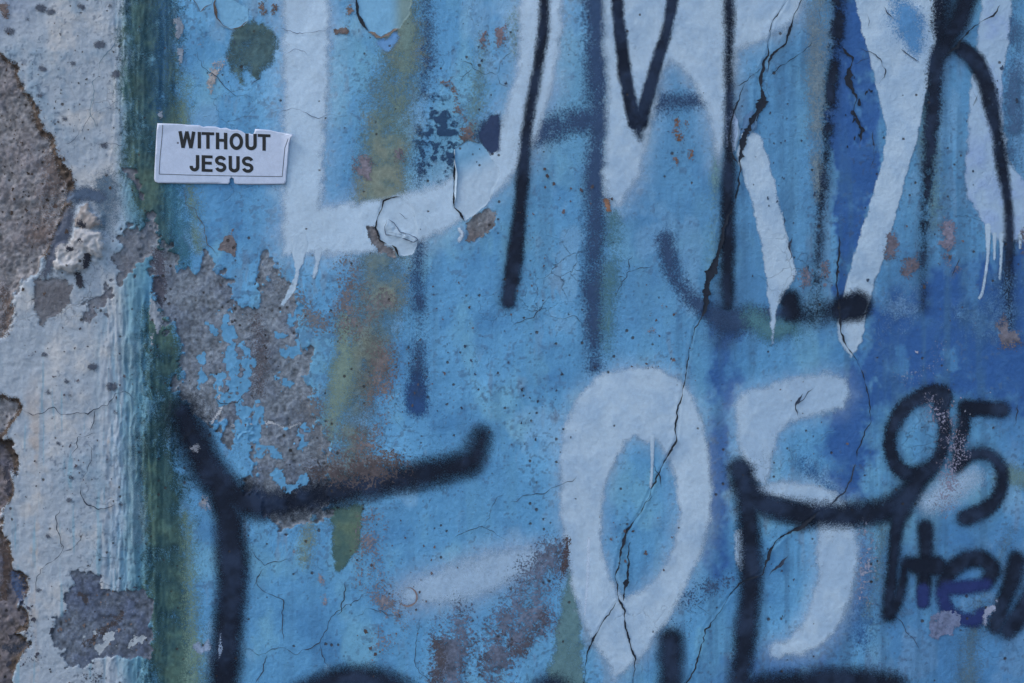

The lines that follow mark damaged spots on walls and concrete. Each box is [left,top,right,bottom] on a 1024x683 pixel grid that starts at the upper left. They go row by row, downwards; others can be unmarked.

peeling [173,17,184,65]
crack [842,8,917,172]
peeling [0,52,573,683]
crack [583,0,812,683]
crack [686,239,871,683]